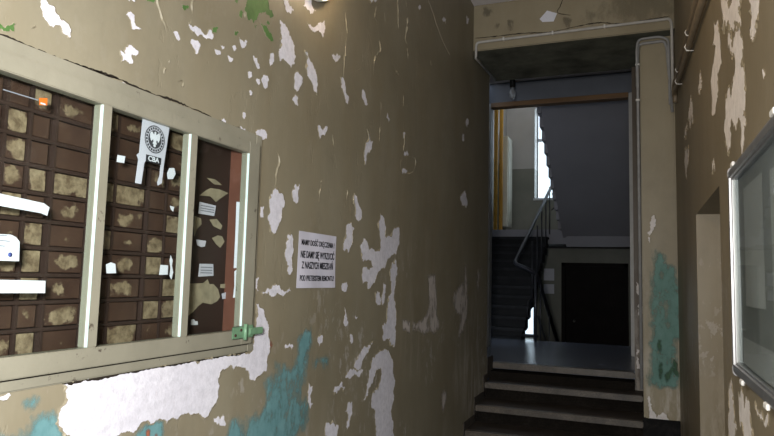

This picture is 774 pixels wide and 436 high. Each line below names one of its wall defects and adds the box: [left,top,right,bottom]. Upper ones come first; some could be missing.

peeling [39,0,72,39]
crack [0,34,234,126]
peeling [119,43,139,64]
peeling [188,23,248,63]
peeling [247,0,318,106]
peeling [303,0,326,38]
crack [480,0,619,38]
peeling [684,0,760,180]
peeling [259,183,300,235]
peeling [332,192,400,436]
peeling [55,276,291,436]
peeling [728,378,769,436]